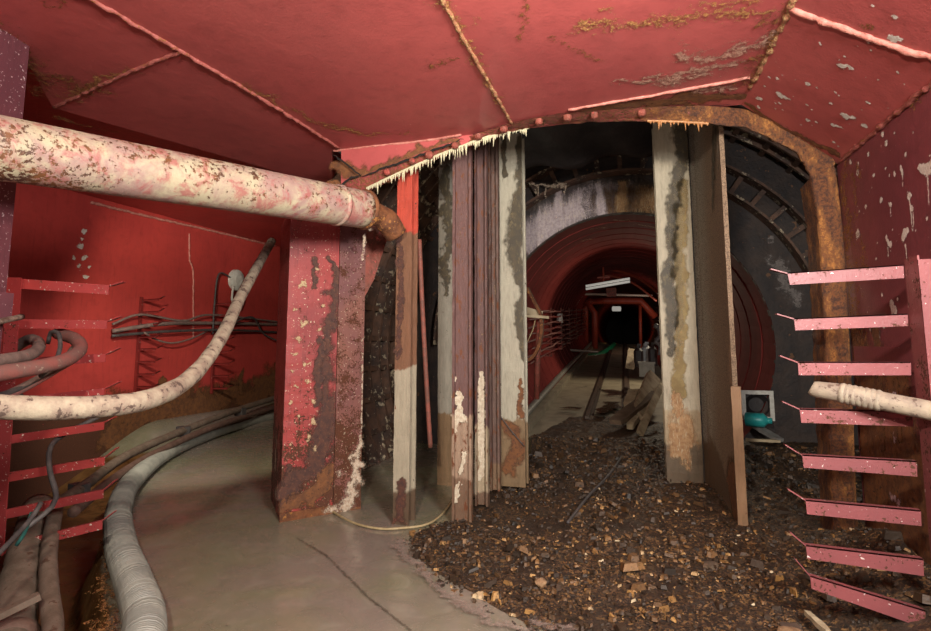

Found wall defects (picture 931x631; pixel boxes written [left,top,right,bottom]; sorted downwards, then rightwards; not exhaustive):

corrosion [548,0,868,269]
leakage [501,124,689,362]
corrosion [667,124,705,482]
corrosion [277,256,339,513]
peeling [451,377,467,433]
peeling [455,451,467,503]
peeling [478,371,486,481]
corrosion [501,378,525,477]
corrosion [726,456,737,521]
crack [298,538,412,630]